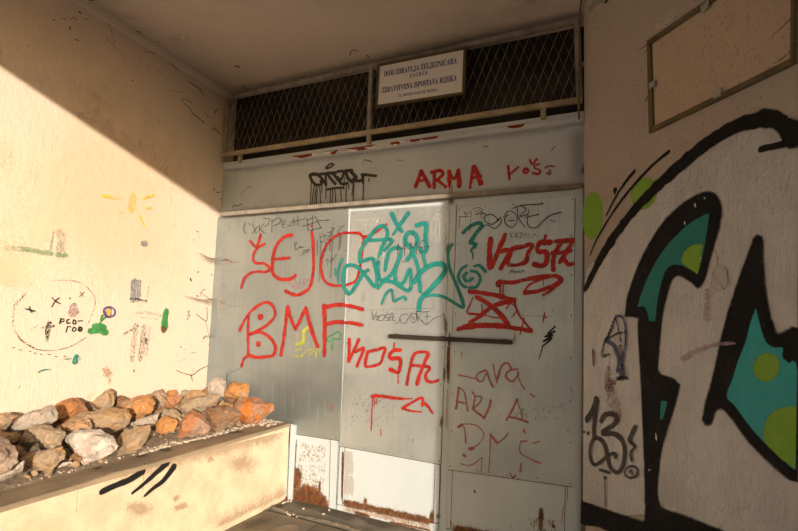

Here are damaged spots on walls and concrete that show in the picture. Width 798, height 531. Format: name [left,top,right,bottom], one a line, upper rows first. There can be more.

rust [293,439,329,508]
rust [341,452,437,531]
rust [531,507,555,531]